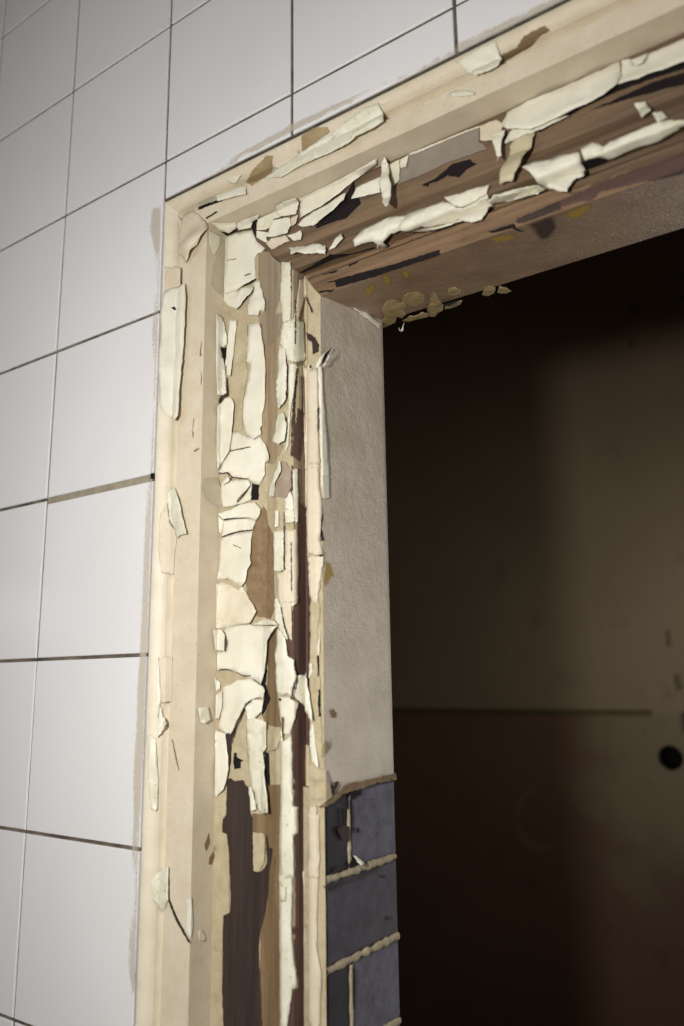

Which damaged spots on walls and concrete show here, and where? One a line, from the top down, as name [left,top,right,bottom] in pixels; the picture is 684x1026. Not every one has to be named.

peeling [456,26,550,76]
peeling [158,39,684,1026]
peeling [147,656,172,811]